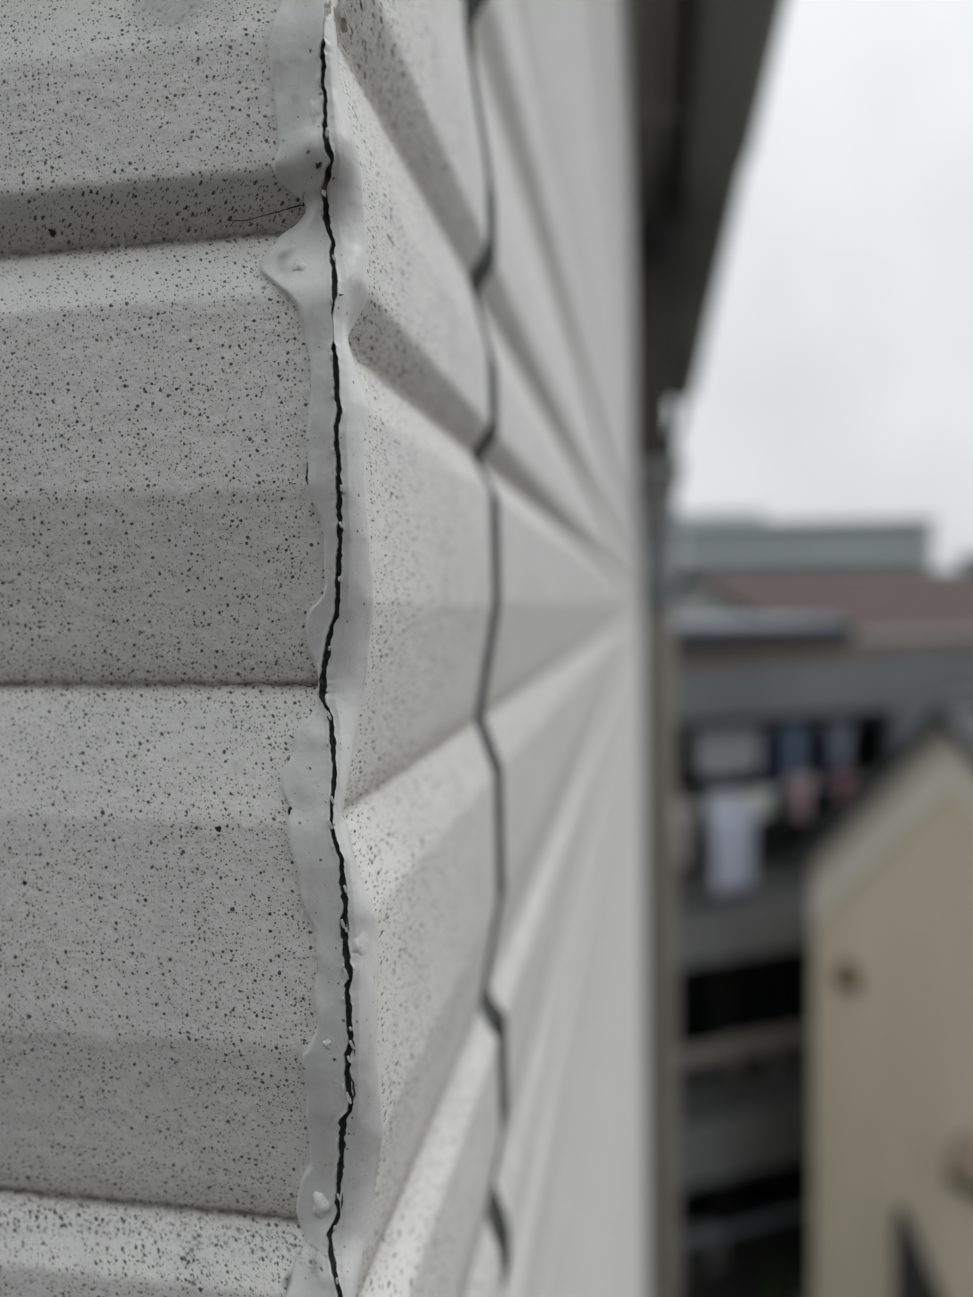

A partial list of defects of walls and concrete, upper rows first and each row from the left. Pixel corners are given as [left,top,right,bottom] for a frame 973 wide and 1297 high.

crack [213,42,356,1297]